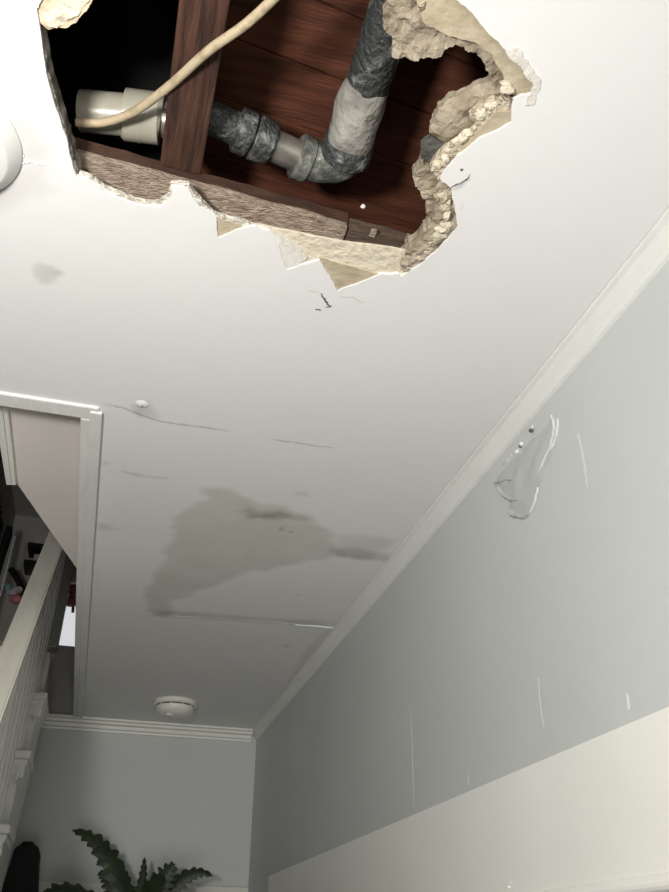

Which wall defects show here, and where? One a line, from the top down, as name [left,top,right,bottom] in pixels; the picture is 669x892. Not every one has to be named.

peeling [507,47,541,106]
spalling [40,23,251,237]
spalling [400,134,457,273]
peeling [319,257,378,290]
crack [100,402,238,433]
peeling [494,414,559,520]